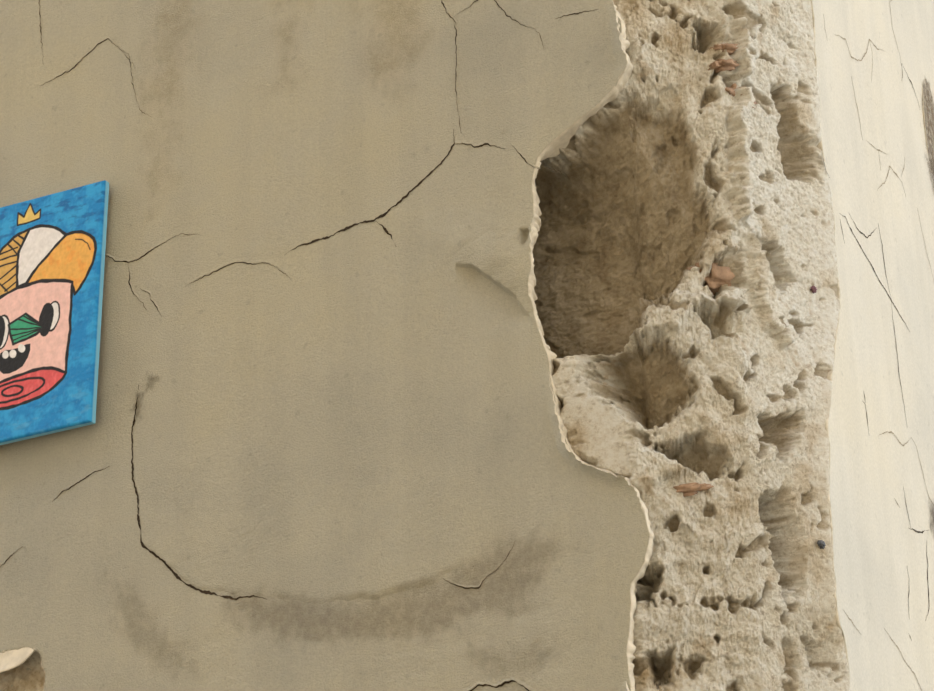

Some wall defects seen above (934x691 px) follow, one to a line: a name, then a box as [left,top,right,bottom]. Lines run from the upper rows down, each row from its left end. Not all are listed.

crack [39,0,151,117]
crack [555,8,599,19]
crack [185,0,544,285]
crack [823,0,934,280]
crack [105,233,193,317]
spalling [525,0,850,691]
crack [840,216,934,617]
crack [0,545,23,567]
spalling [0,647,45,691]
peeling [465,677,537,691]